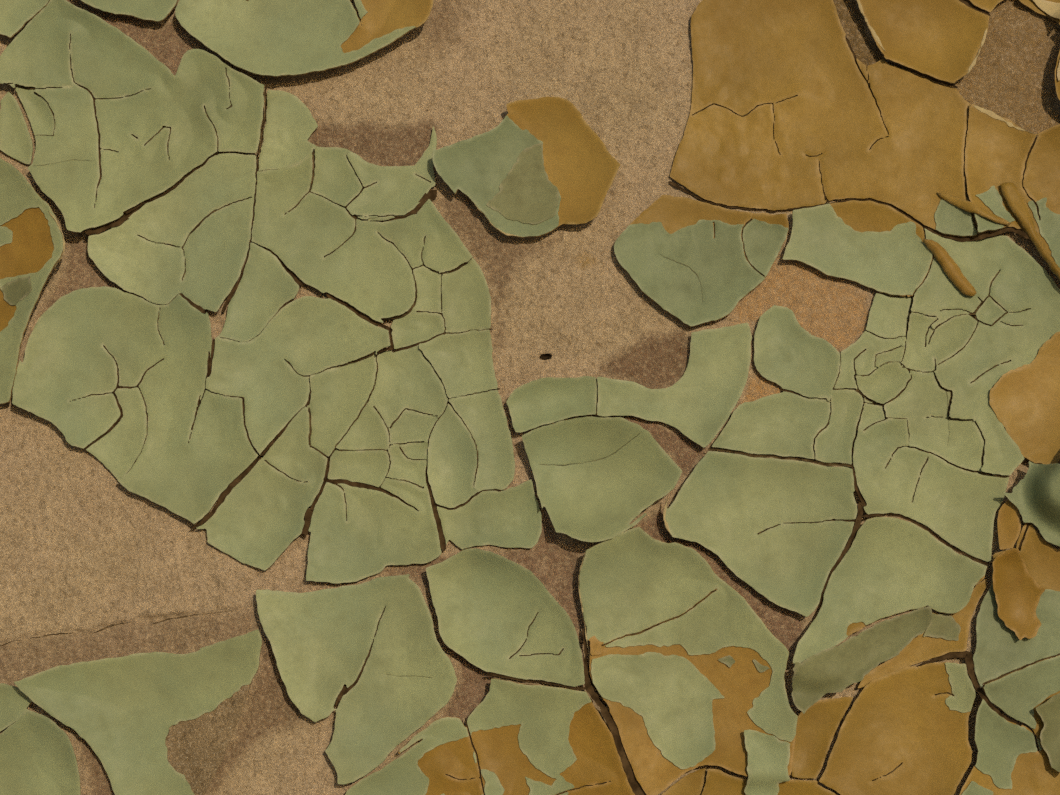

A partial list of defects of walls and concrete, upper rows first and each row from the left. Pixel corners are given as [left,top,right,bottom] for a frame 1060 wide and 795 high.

crack [6,35,500,551]
peeling [0,0,635,795]
peeling [506,0,1060,795]
crack [668,37,1040,609]
crack [959,0,991,16]
crack [916,651,1060,726]